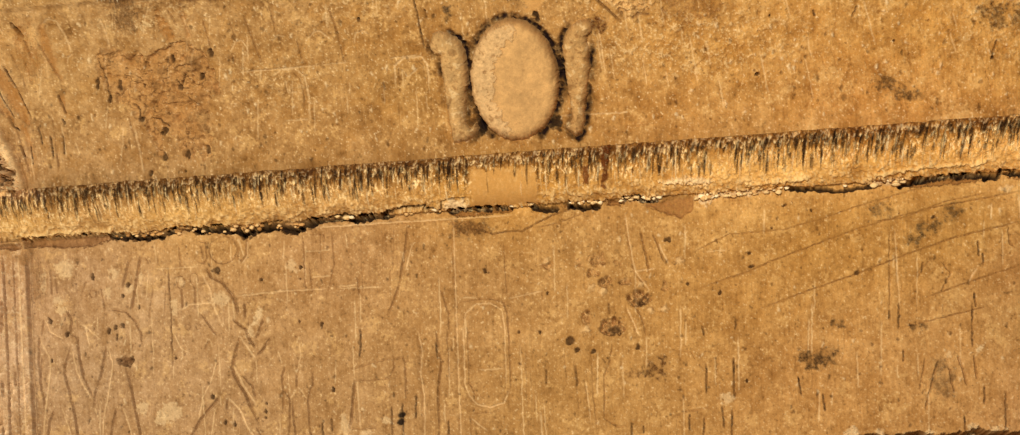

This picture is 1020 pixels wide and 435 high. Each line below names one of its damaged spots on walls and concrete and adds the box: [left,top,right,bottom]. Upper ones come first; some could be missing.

spalling [607,0,663,18]
spalling [96,41,216,174]
spalling [586,254,652,309]
spalling [582,311,628,338]